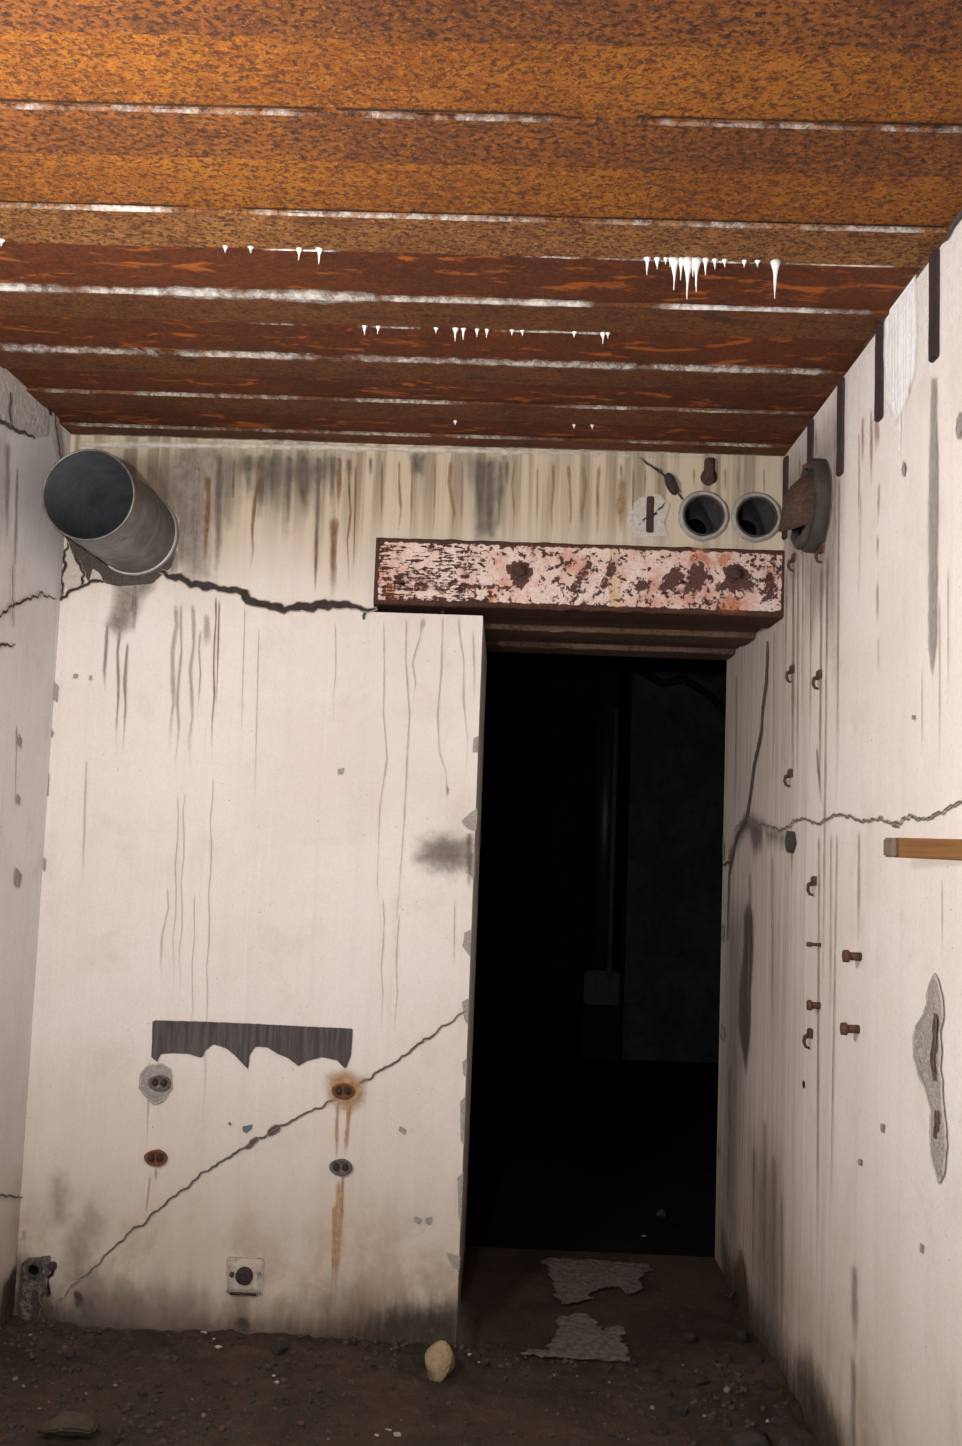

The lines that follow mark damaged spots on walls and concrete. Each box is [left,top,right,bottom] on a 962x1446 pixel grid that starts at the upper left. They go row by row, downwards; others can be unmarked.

damp [394,297,585,307]
damp [81,424,676,571]
rust [858,416,879,509]
crack [159,568,378,620]
rust [507,559,533,588]
crack [723,642,962,940]
crack [0,1192,23,1200]
peeling [138,1020,353,1105]
crack [59,1009,468,1301]
rust [332,1176,344,1269]
rust [330,1074,361,1146]
spalling [912,973,947,1184]